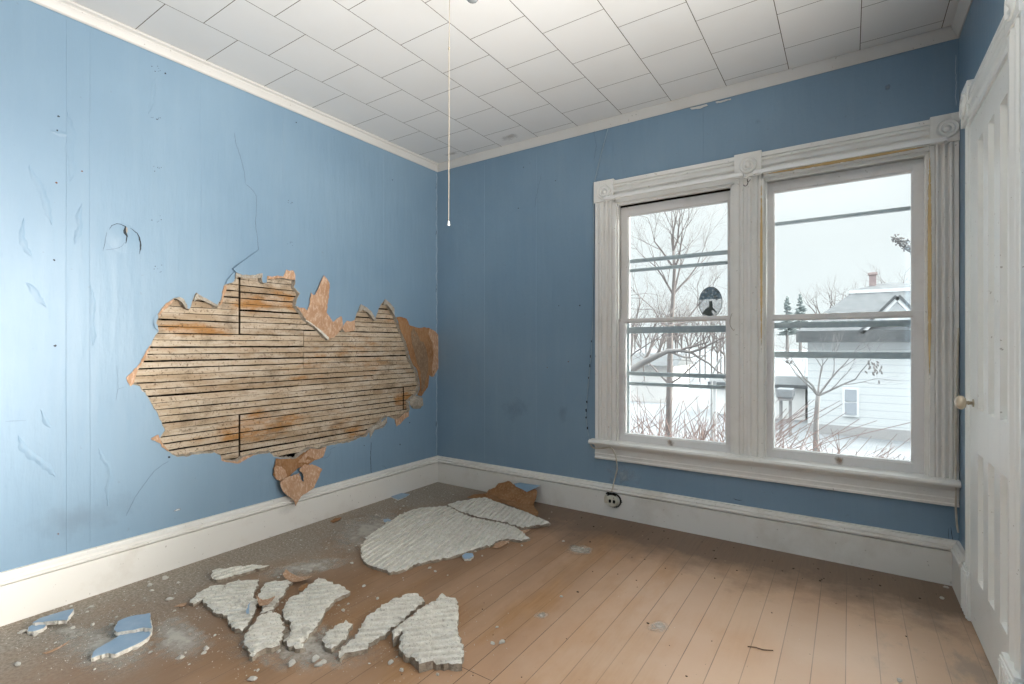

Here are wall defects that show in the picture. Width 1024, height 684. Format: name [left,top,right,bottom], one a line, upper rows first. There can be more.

spalling [126,270,438,464]